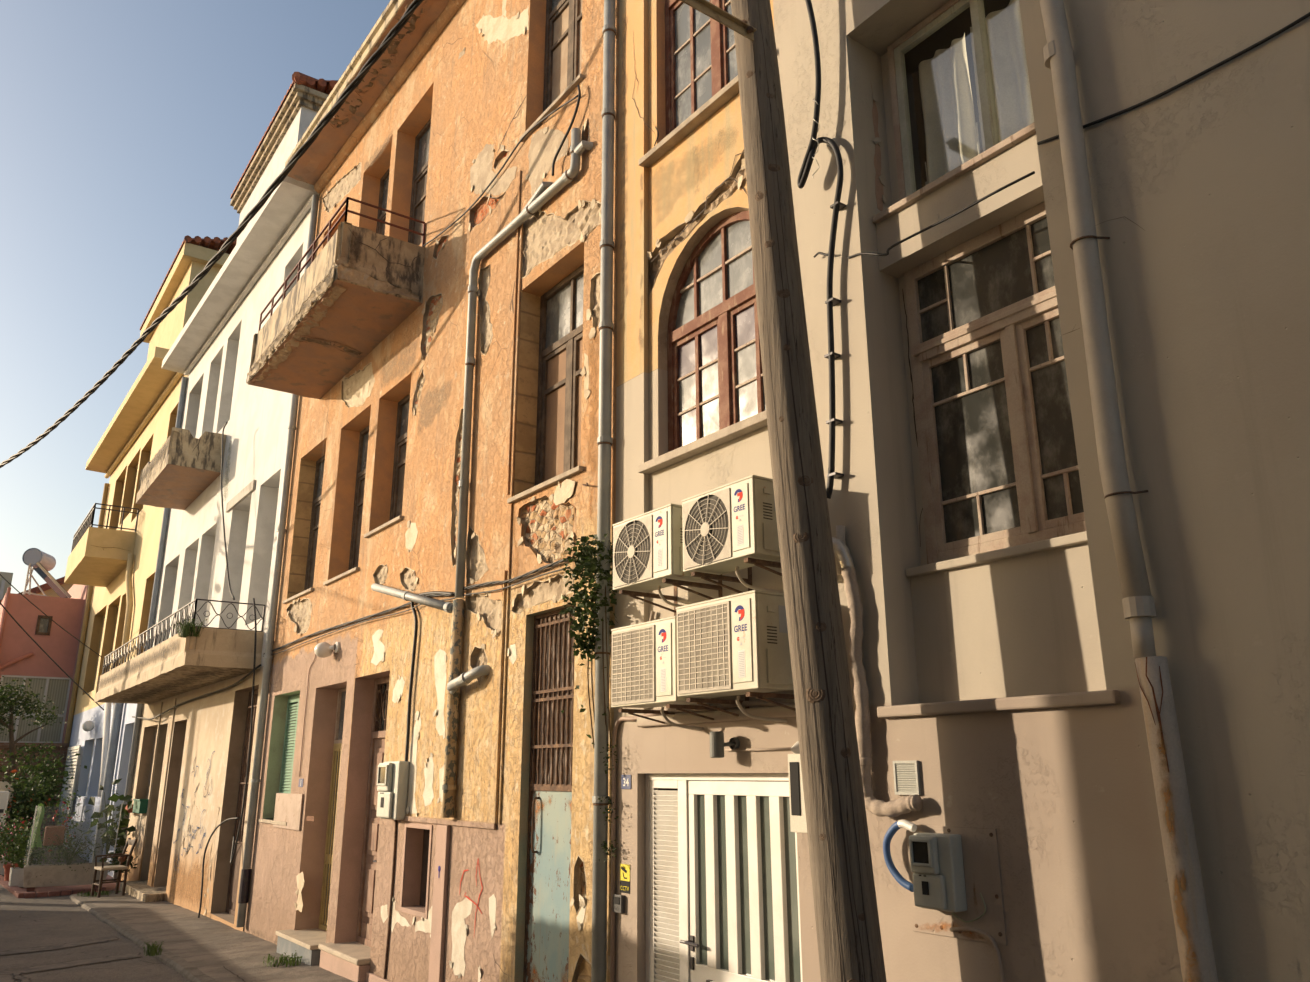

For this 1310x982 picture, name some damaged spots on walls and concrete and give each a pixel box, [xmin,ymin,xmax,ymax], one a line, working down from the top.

peeling [476,0,529,44]
spalling [468,118,601,279]
spalling [647,150,746,296]
spalling [246,260,443,415]
spalling [451,408,576,684]
peeling [381,898,432,938]
peeling [449,898,481,982]
spalling [570,855,587,930]
spalling [572,953,591,982]